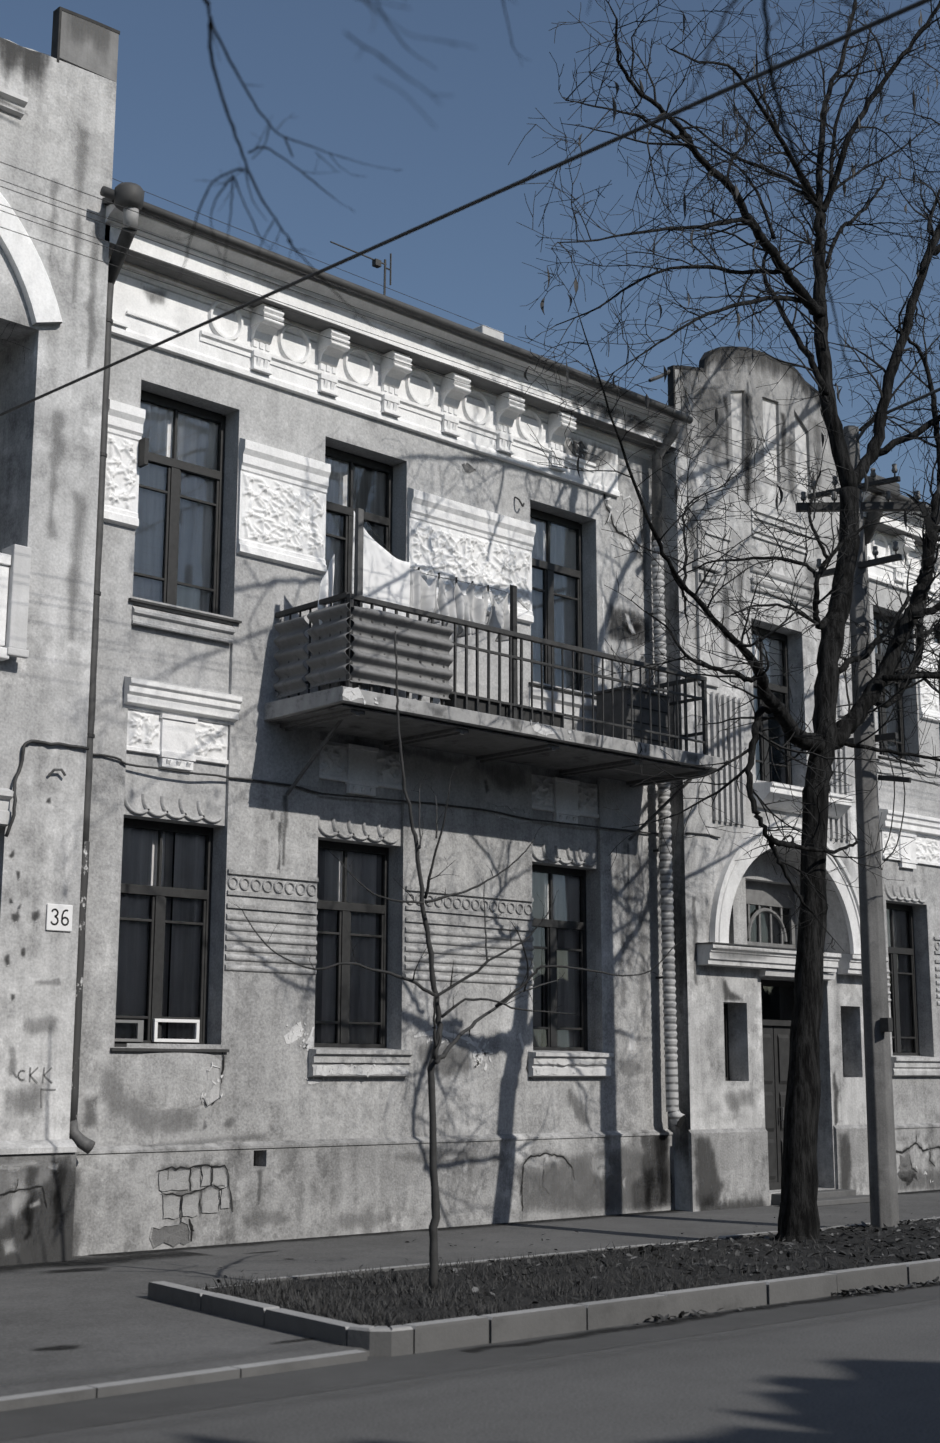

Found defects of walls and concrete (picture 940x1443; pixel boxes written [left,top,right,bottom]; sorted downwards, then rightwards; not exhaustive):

leakage [0,37,49,79]
flaking render [414,1030,493,1071]
flaking render [201,1062,223,1106]
crack [896,1135,940,1173]
leakage [0,1159,79,1266]
flaking render [150,1166,230,1248]